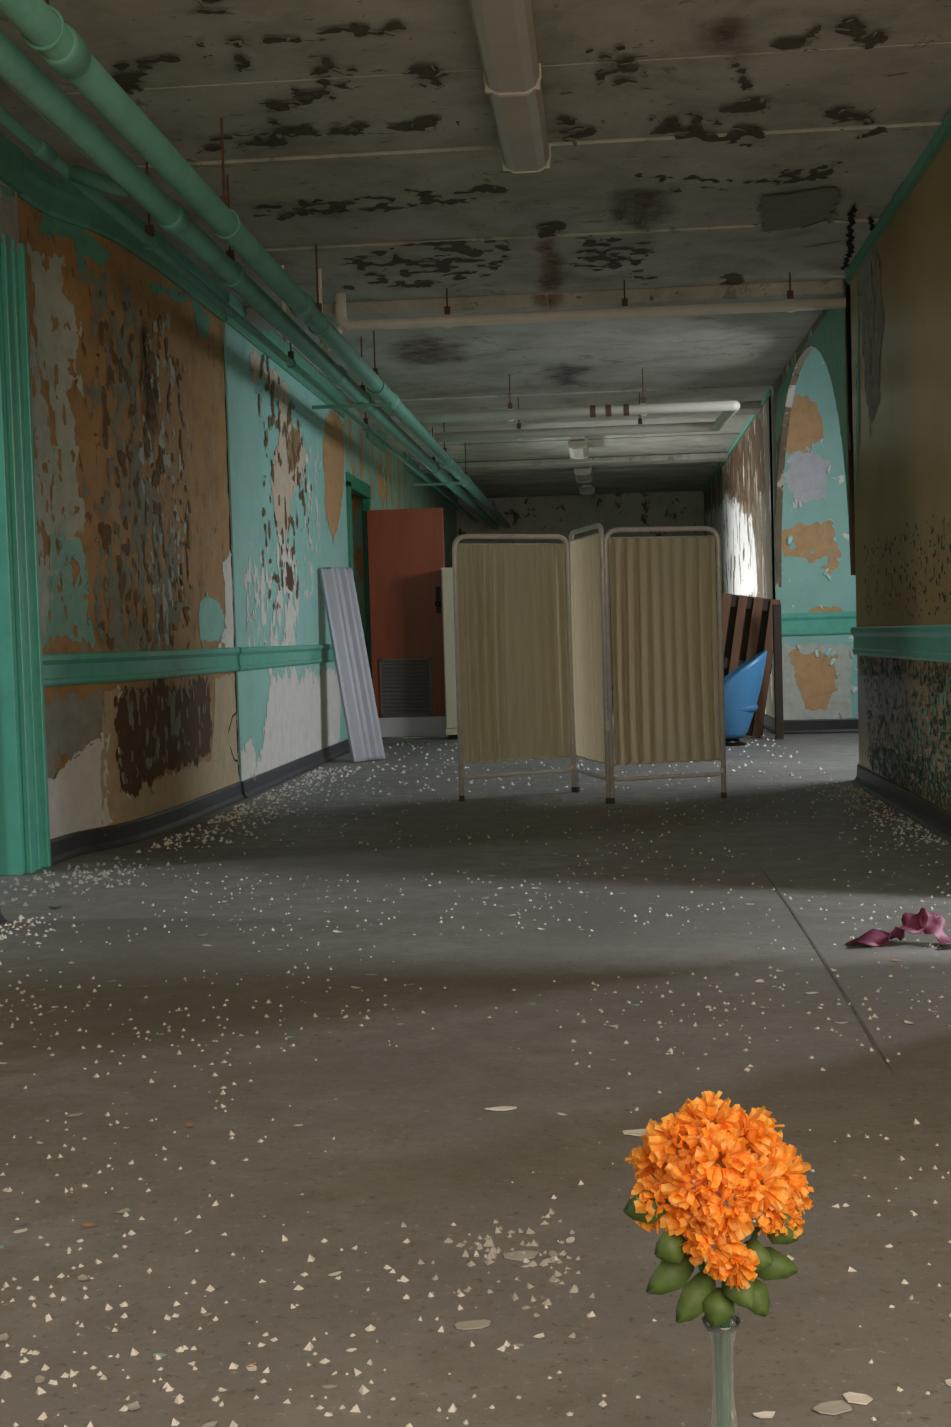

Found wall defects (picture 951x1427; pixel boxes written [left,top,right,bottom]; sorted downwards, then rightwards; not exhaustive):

peeling [27,213,345,652]
peeling [706,246,884,597]
peeling [808,605,843,613]
peeling [44,664,341,839]
peeling [782,643,951,801]